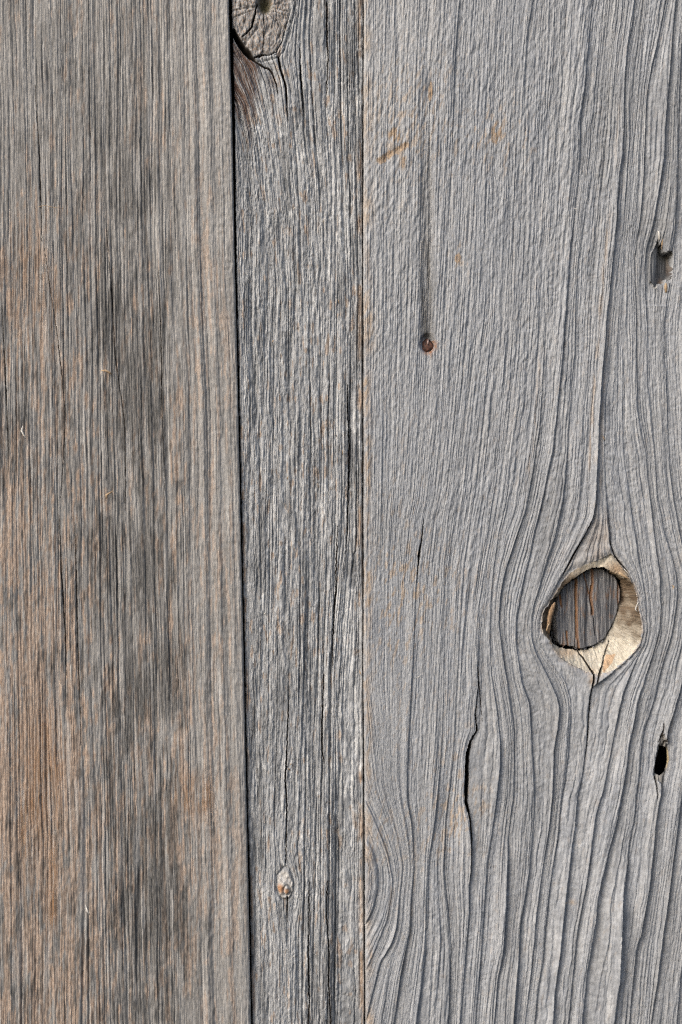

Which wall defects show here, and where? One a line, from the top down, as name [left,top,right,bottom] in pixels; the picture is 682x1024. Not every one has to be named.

crack [464,666,482,856]